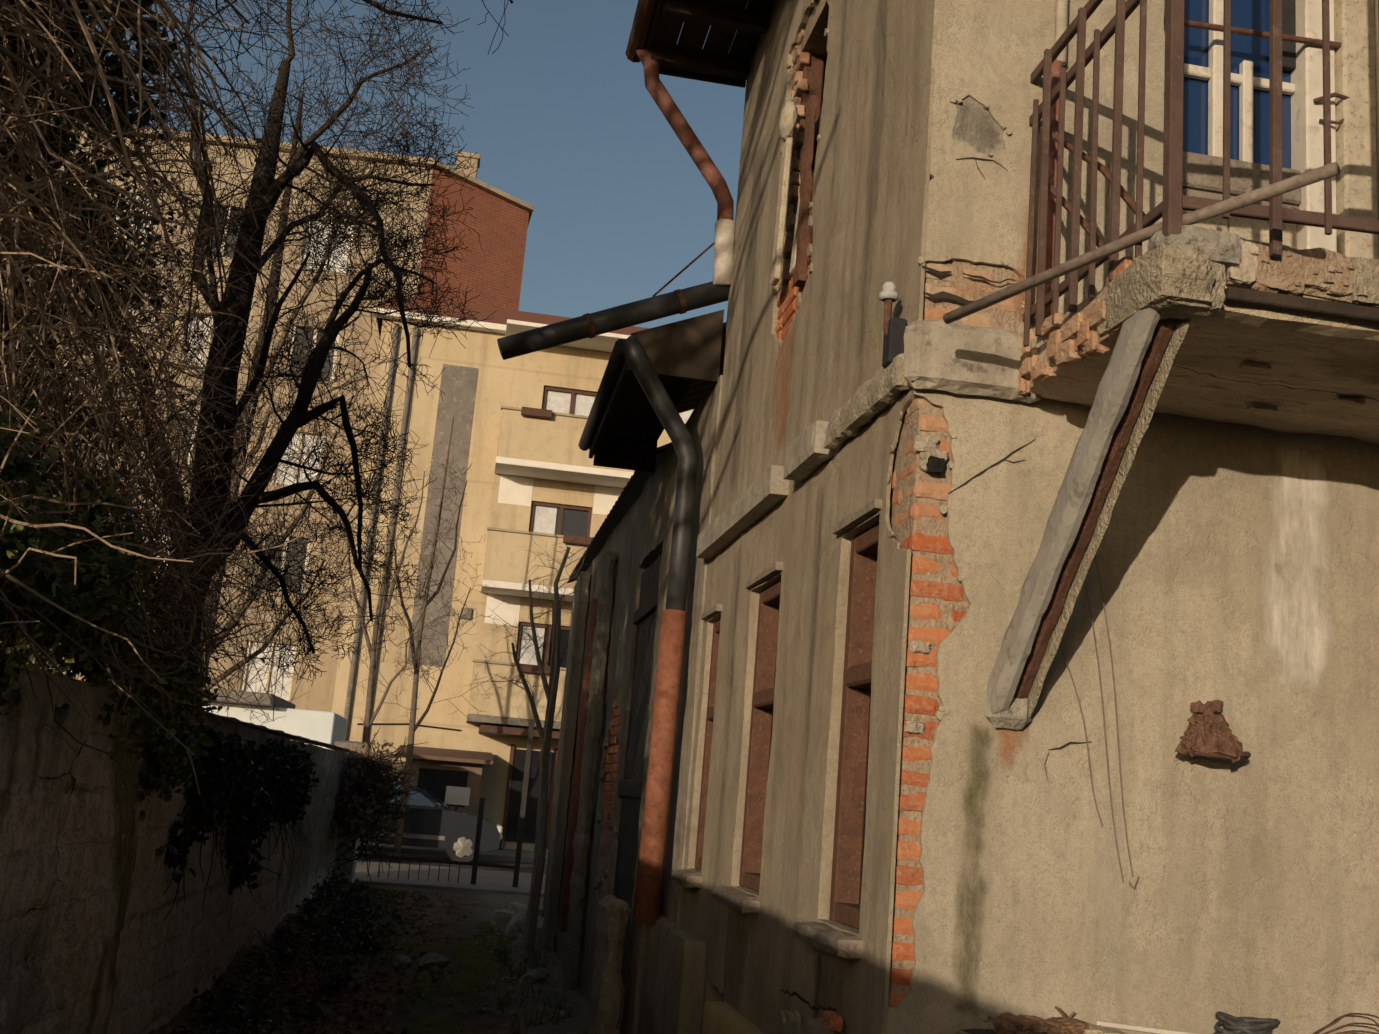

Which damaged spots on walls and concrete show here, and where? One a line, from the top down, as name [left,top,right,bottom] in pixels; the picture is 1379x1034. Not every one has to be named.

flaking render [772,28,821,340]
flaking render [918,253,1026,327]
spalling [1017,225,1379,395]
flaking render [886,396,966,1007]
water stain [1266,447,1331,686]
crack [5,708,90,1026]